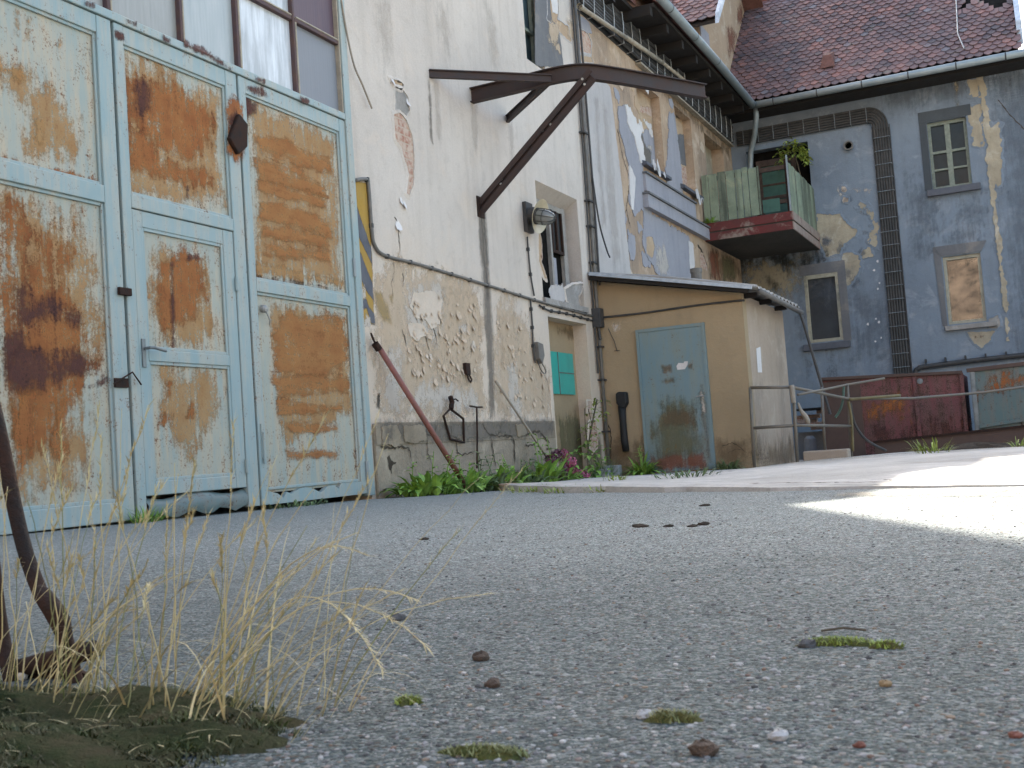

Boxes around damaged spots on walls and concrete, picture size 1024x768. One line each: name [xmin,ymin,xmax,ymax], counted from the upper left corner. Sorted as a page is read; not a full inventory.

corrosion [0,59,93,180]
corrosion [0,189,108,502]
corrosion [146,244,213,348]
corrosion [125,55,344,290]
corrosion [270,303,352,460]
spalling [387,75,416,208]
peeling [362,253,557,448]
peeling [613,85,704,278]
corrosion [651,392,709,471]
peeling [816,183,881,291]
flaking render [967,79,1003,186]
corrosion [977,367,1024,401]